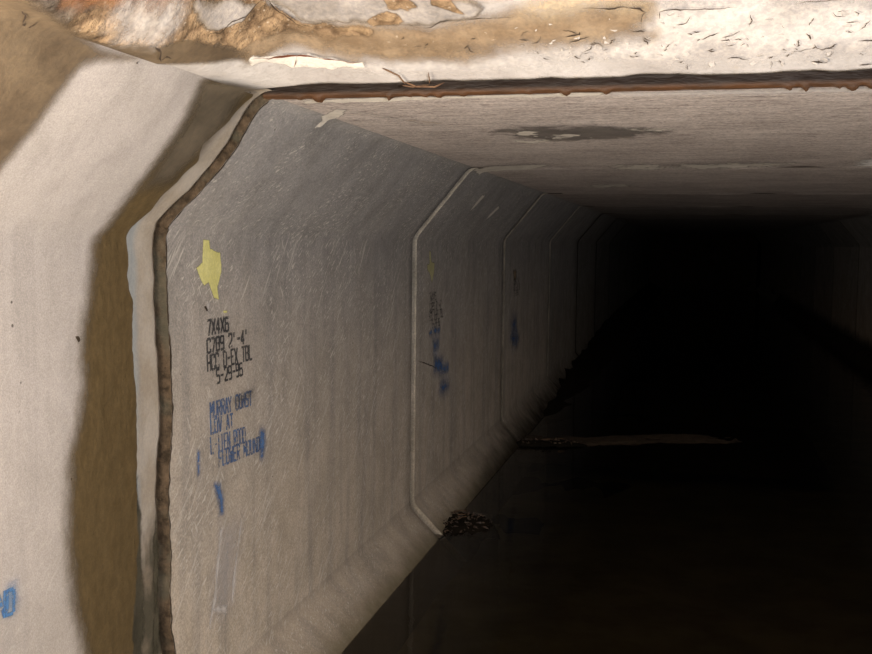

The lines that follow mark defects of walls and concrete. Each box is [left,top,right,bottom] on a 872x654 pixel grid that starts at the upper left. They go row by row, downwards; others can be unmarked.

spalling [30,0,652,70]
peeling [656,13,748,69]
peeling [728,18,836,67]
damp [0,0,872,168]
corrosion [263,69,872,103]